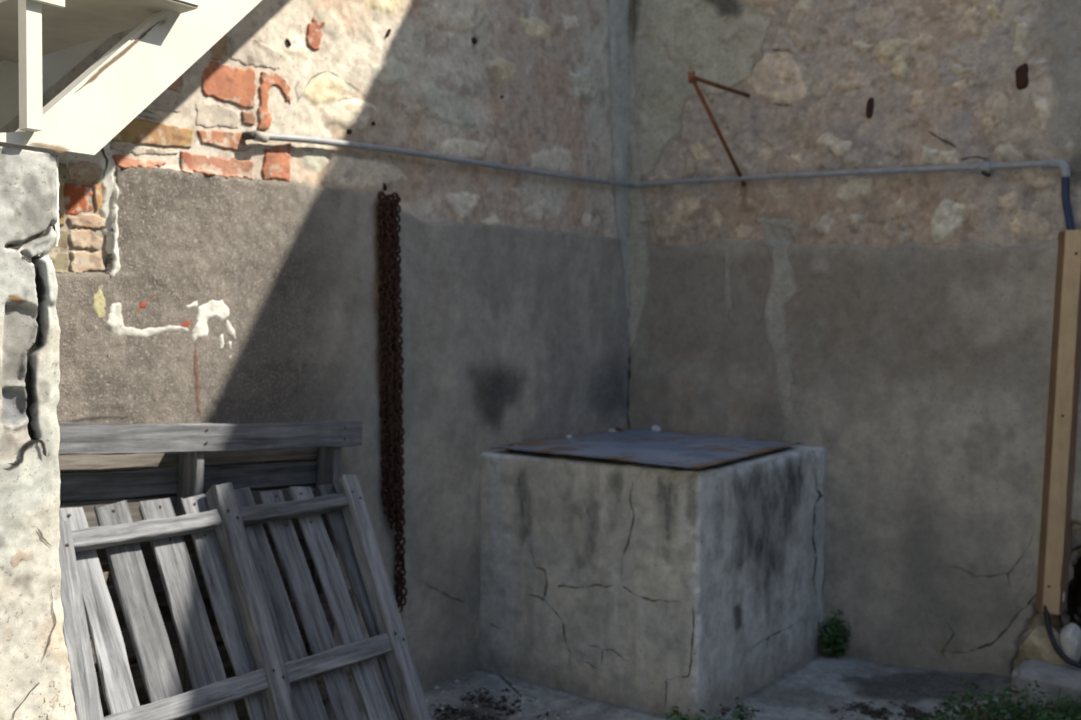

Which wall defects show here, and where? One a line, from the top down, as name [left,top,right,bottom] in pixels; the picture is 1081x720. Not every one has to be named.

spalling [306,16,325,51]
spalling [110,34,292,182]
spalling [49,153,106,274]
crack [7,224,134,466]
peeling [93,287,236,357]
crack [518,477,695,709]
leakage [739,466,801,569]
crack [813,470,825,606]
crack [933,537,1037,658]
spalling [1057,531,1081,630]